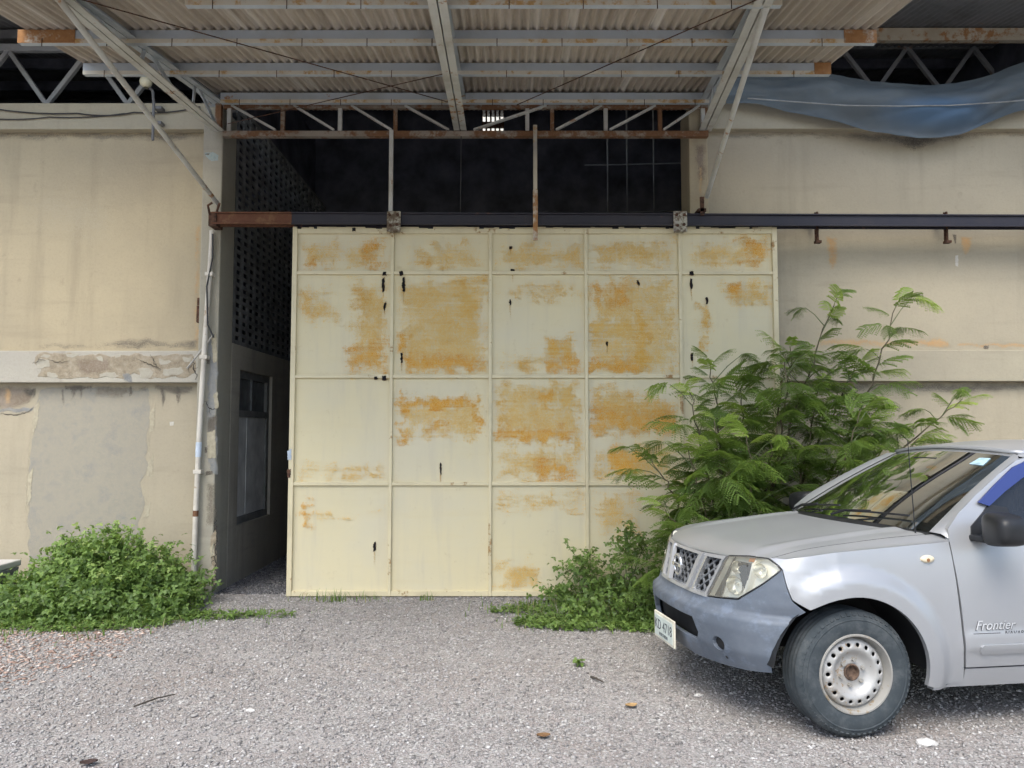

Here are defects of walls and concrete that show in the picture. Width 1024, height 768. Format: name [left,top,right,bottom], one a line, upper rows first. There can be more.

corrosion [298,227,678,381]
corrosion [688,234,772,366]
peeling [0,333,219,570]
corrosion [393,331,679,541]